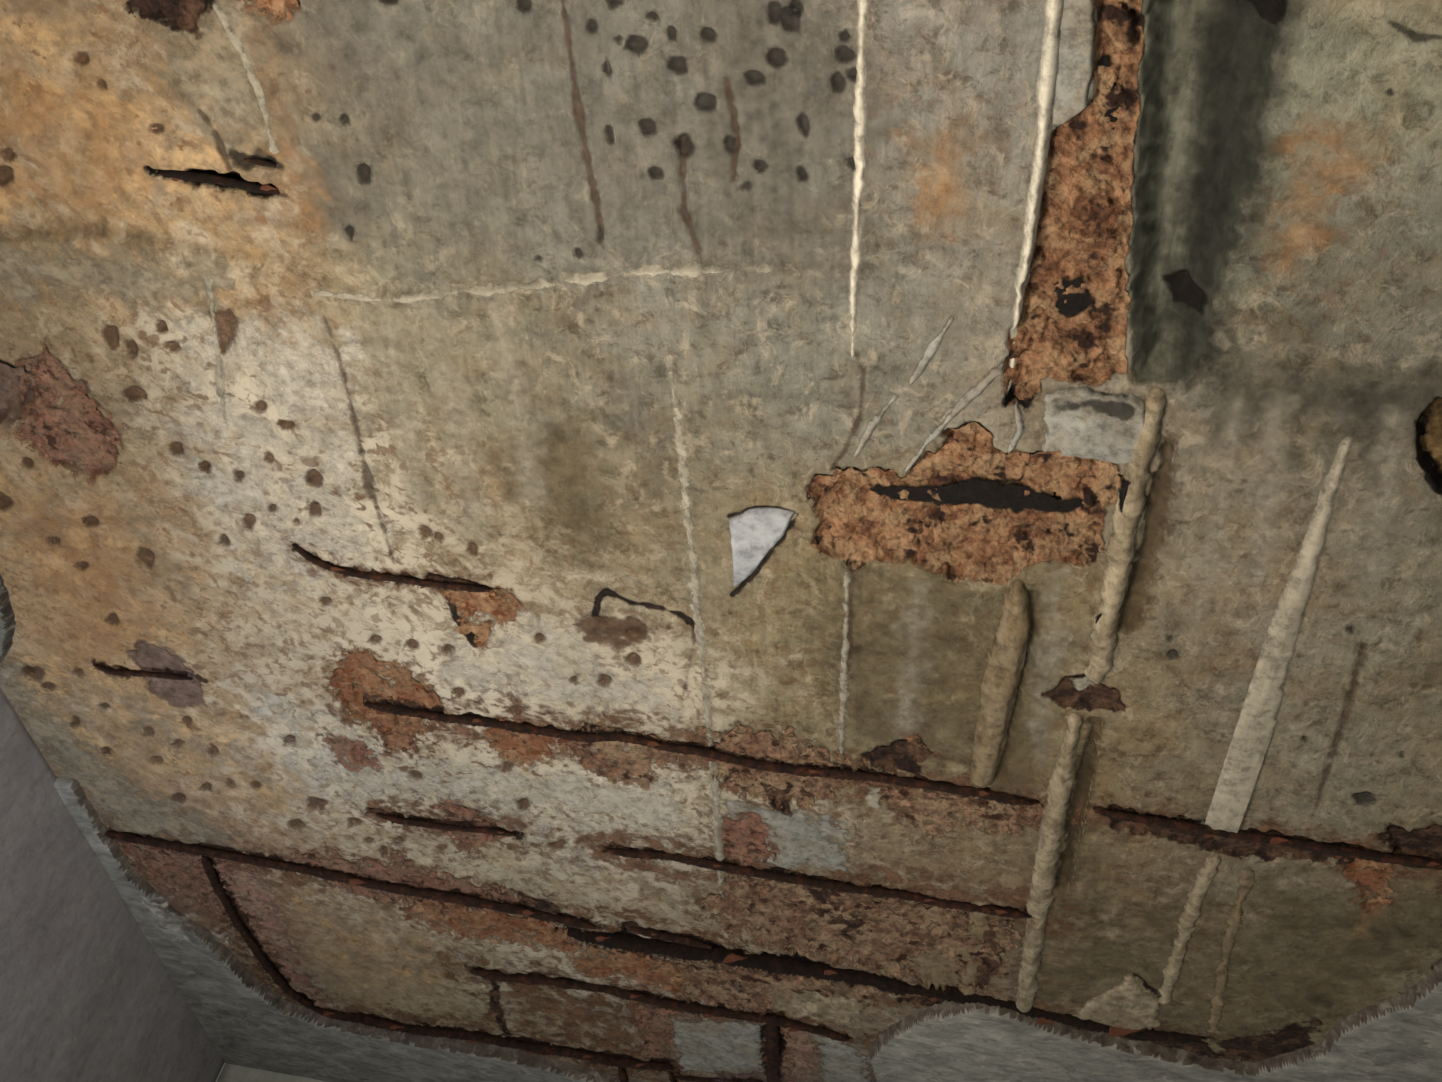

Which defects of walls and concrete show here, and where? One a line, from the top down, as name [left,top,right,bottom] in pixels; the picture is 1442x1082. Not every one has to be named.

crack [562,2,602,227]
crack [679,137,700,254]
spalling [806,0,1146,586]
spalling [1415,397,1442,496]
rust [0,474,307,813]
spalling [316,635,464,779]
rust [353,795,562,854]
crack [591,589,696,642]
rust [103,820,1217,1082]
rust [320,670,1048,831]
peeling [53,720,1442,1082]
peeling [729,508,794,587]